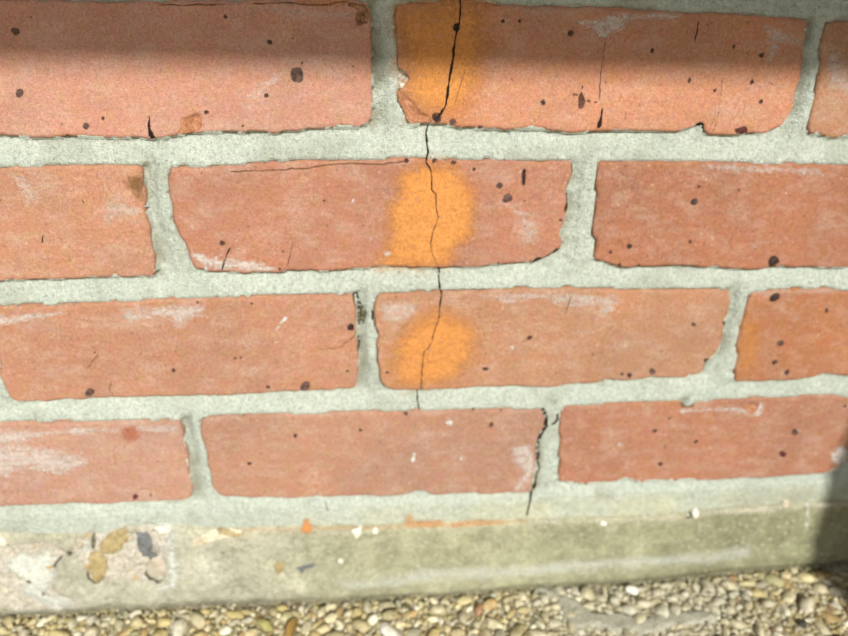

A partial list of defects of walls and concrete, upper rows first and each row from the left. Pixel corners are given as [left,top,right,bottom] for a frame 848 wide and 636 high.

crack [162,1,224,9]
crack [231,0,465,408]
rust [380,166,475,267]
rust [395,313,476,385]
crack [526,408,559,516]
spalling [0,524,170,610]